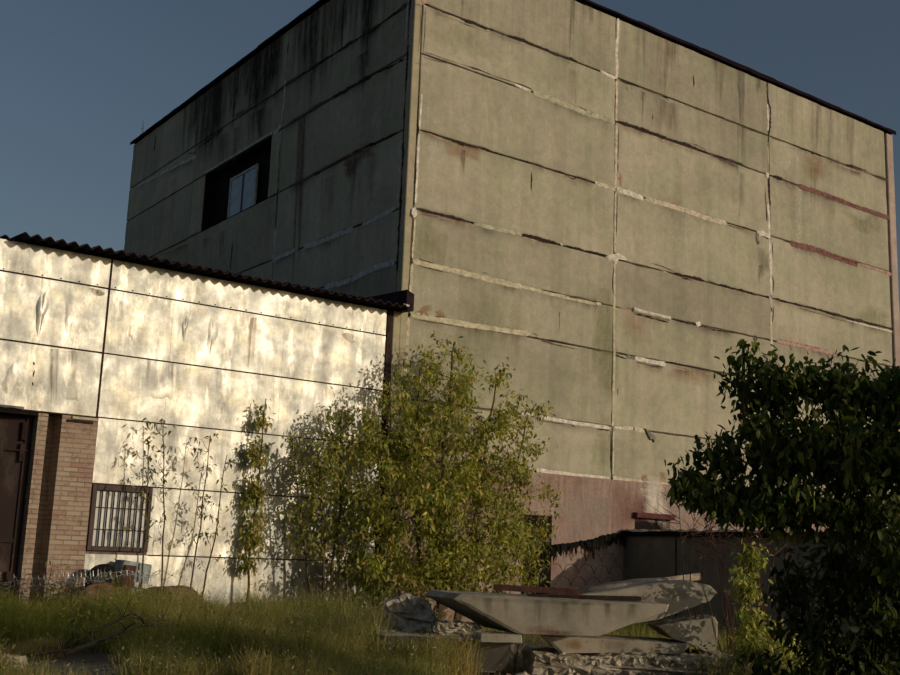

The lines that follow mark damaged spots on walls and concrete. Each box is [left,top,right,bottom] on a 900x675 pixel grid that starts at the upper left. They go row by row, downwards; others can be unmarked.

water stain [194,38,280,144]
crack [188,0,600,290]
crack [615,75,888,251]
crack [414,313,465,328]
crack [522,195,893,388]
crack [598,413,614,474]